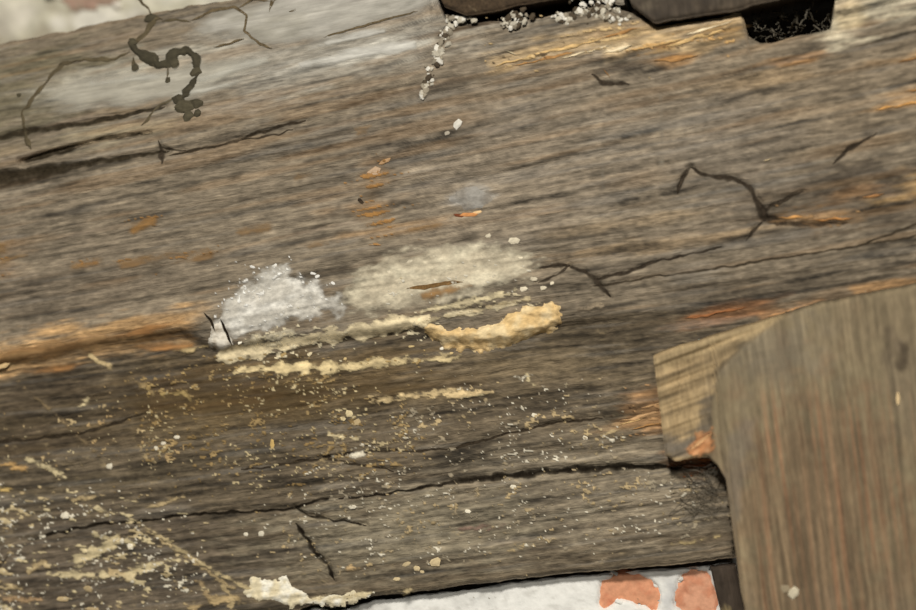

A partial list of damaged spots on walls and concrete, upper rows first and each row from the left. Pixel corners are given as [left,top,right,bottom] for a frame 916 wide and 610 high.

crack [833,132,877,164]
crack [531,166,916,297]
water stain [0,335,112,371]
water stain [151,344,208,356]
water stain [206,280,562,409]
water stain [132,378,198,410]
crack [28,417,716,580]